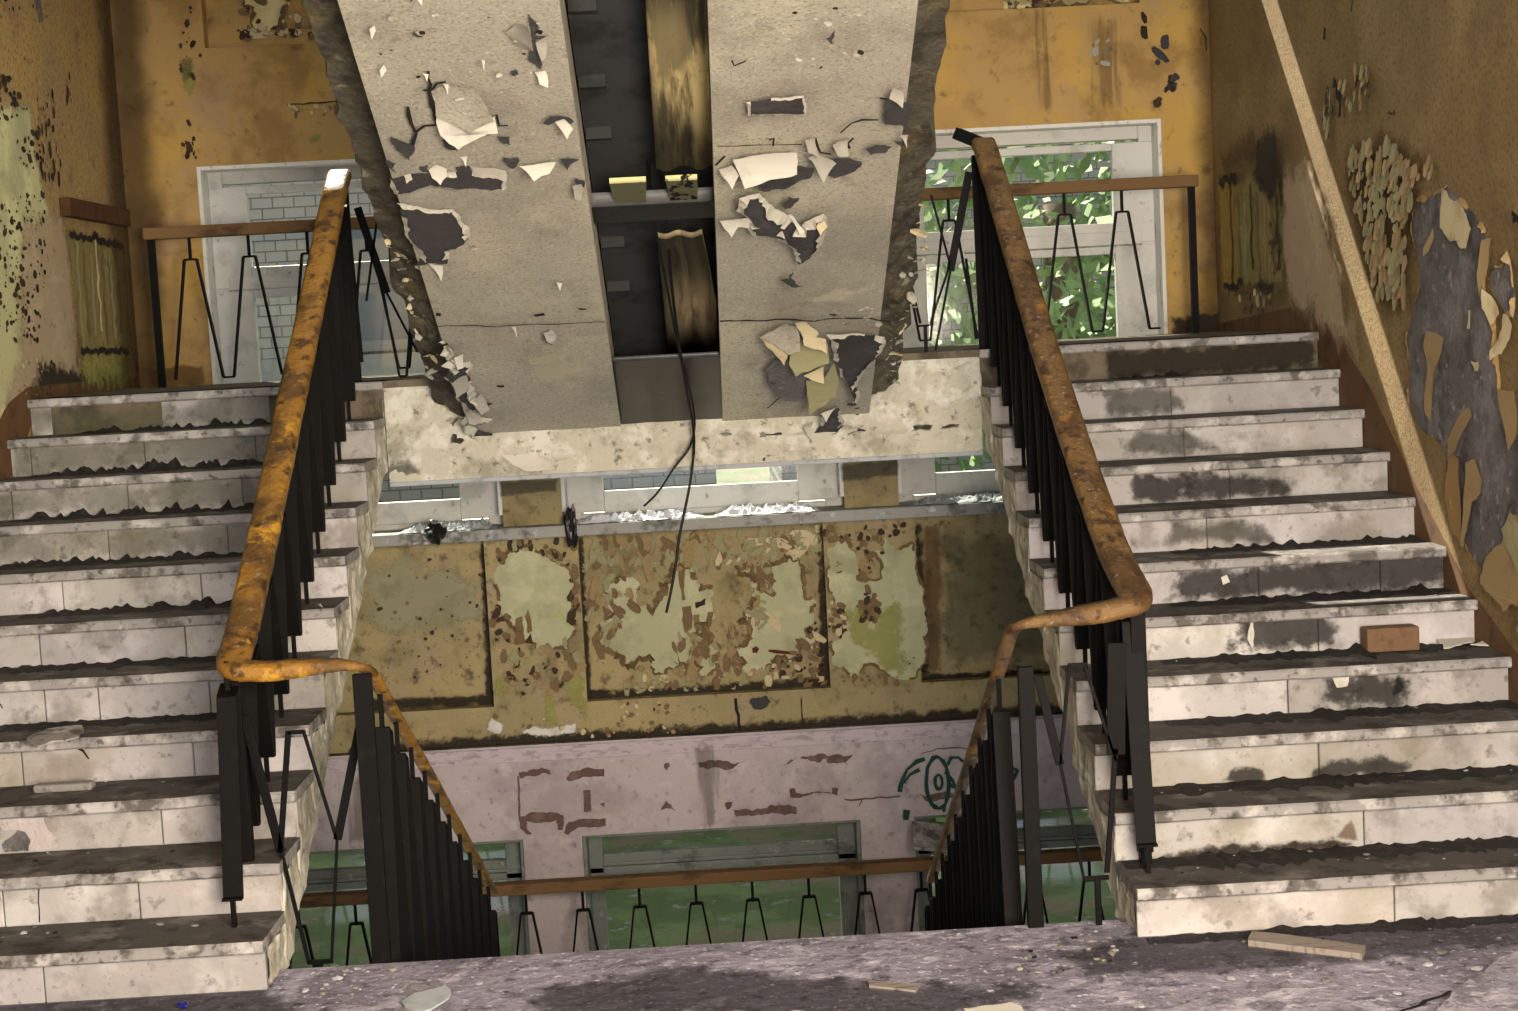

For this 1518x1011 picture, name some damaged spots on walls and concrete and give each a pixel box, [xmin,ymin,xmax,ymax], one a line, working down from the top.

peeling [179,6,202,80]
spalling [237,0,585,471]
spalling [715,0,950,444]
peeling [1004,0,1180,108]
leakage [1172,0,1284,334]
peeling [1322,62,1370,140]
peeling [1347,110,1518,611]
peeling [487,522,929,739]
peeling [1436,637,1489,649]